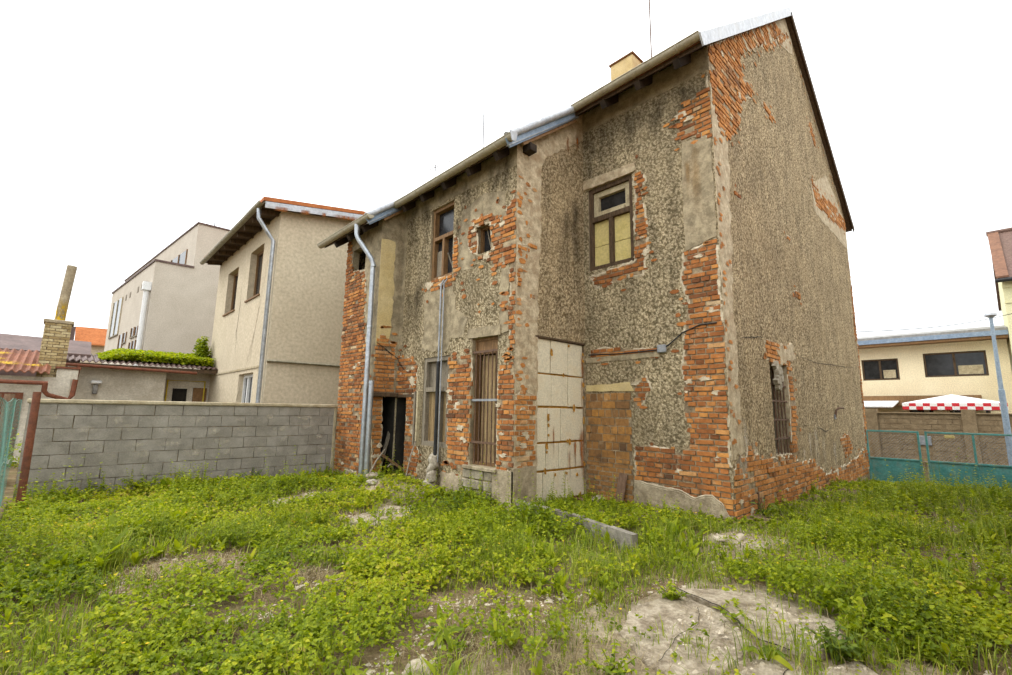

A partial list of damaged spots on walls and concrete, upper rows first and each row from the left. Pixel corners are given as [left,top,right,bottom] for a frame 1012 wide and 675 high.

flaking render [589,171,657,291]
flaking render [663,21,791,151]
flaking render [800,70,846,235]
flaking render [334,242,422,477]
flaking render [422,175,537,476]
flaking render [590,347,658,365]
flaking render [631,161,870,520]